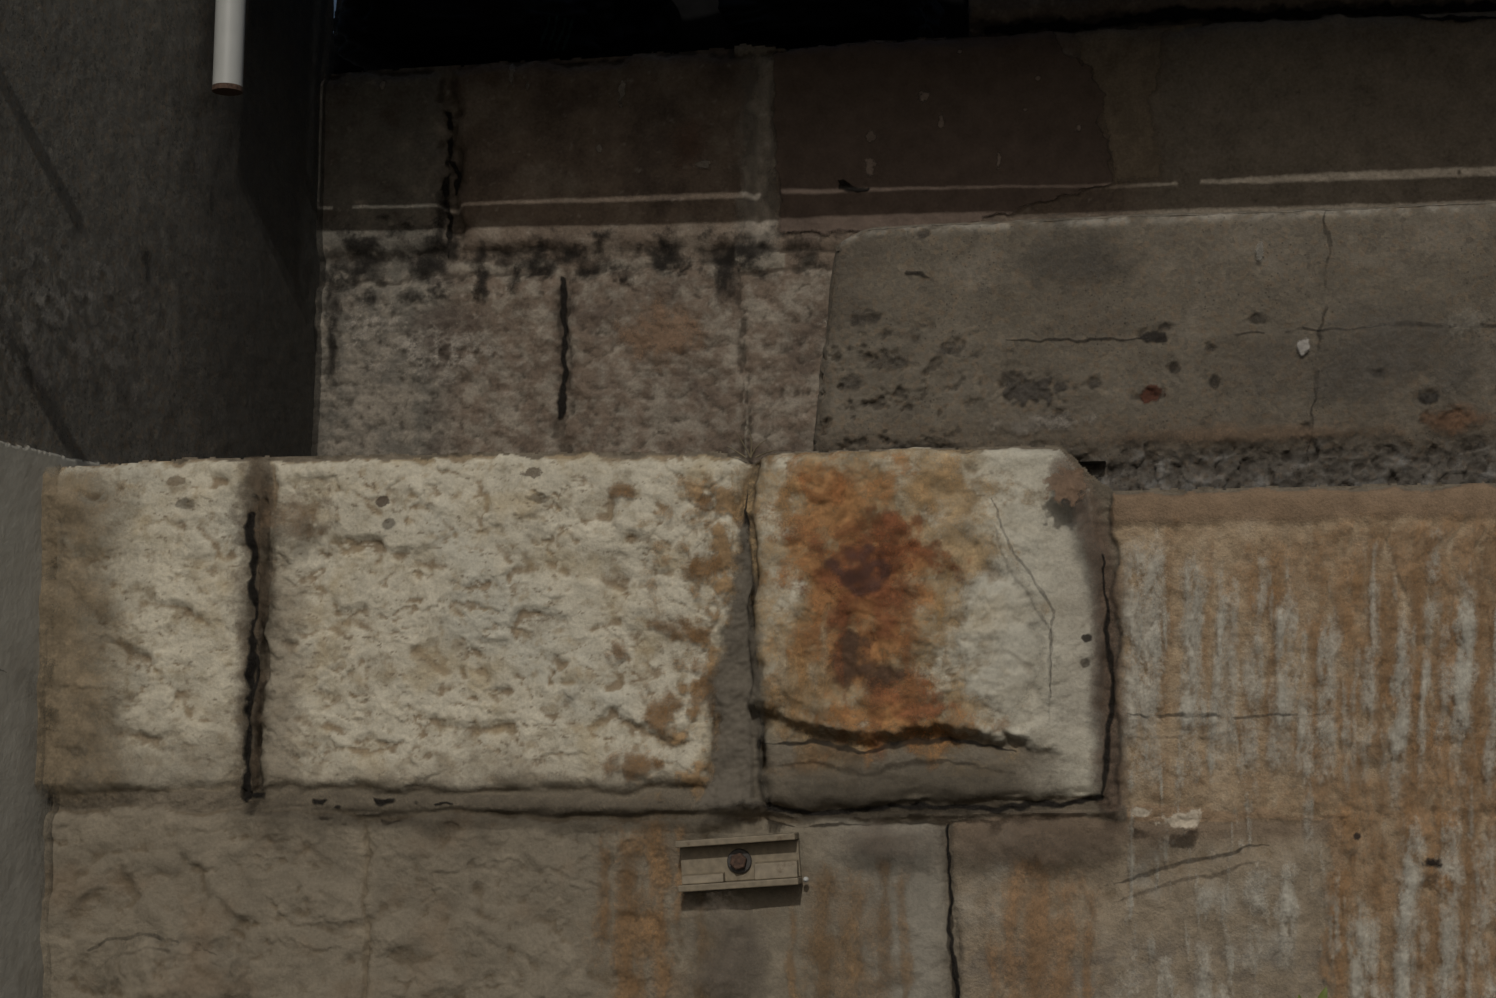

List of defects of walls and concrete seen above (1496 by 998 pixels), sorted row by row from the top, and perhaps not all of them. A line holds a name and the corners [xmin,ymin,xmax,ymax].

crack [441,111,462,258]
crack [557,277,569,419]
corrosion [608,484,634,497]
crack [742,492,750,548]
corrosion [607,641,625,659]
corrosion [645,449,997,771]
efflorescence [1277,609,1345,768]
efflorescence [1391,590,1476,752]
corrosion [605,749,714,800]
crack [757,554,1320,998]
efflorescence [1352,922,1377,998]
efflorescence [1395,837,1424,998]